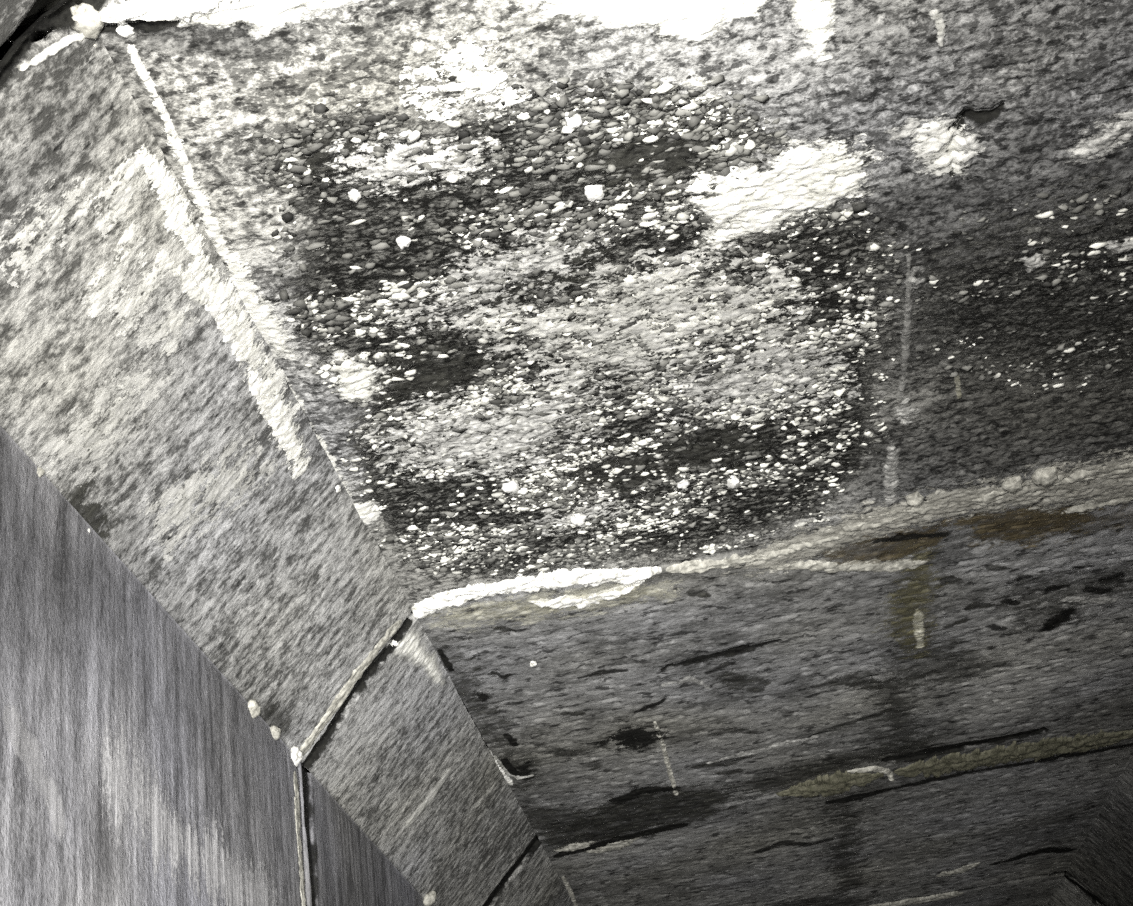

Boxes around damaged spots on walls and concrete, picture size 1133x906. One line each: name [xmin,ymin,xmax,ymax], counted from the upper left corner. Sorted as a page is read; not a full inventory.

crack [0,0,181,91]
water stain [179,0,359,38]
water stain [518,0,767,44]
water stain [792,0,838,62]
water stain [399,32,532,124]
water stain [679,77,711,88]
water stain [892,397,919,425]
water stain [884,447,898,505]
water stain [520,539,1006,858]